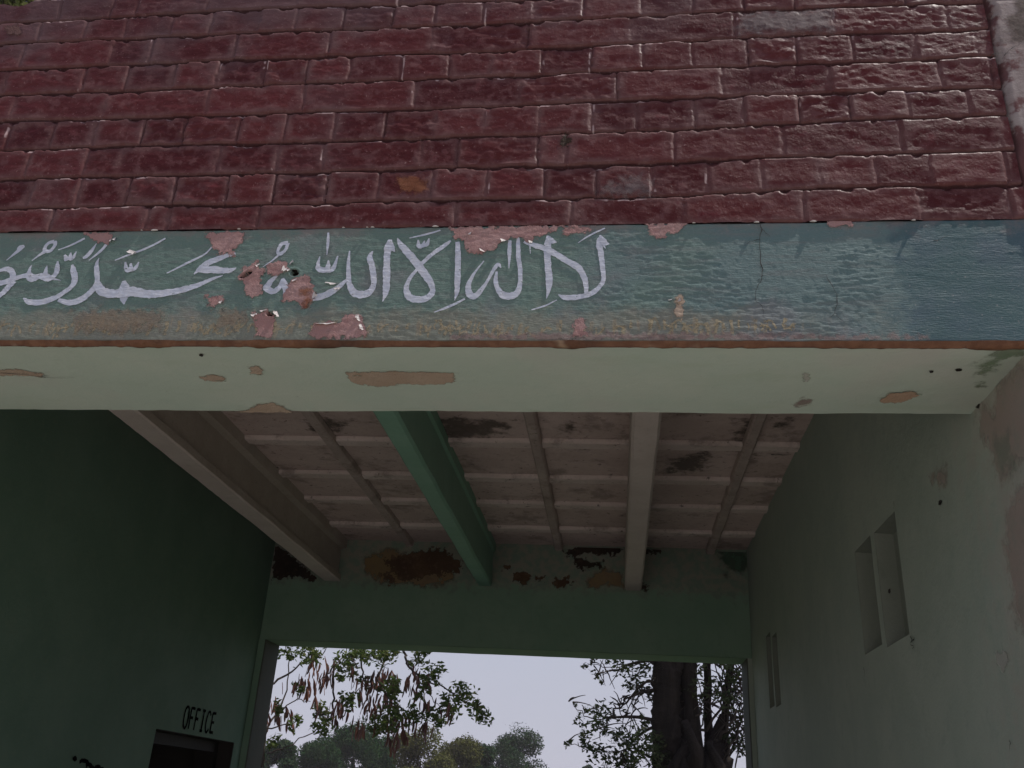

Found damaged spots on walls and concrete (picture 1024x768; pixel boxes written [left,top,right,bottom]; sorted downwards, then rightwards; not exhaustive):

crack [748,223,770,314]
spalling [0,225,1024,351]
peeling [0,369,44,377]
peeling [345,371,455,387]
peeling [880,391,919,403]
damp [441,417,511,438]